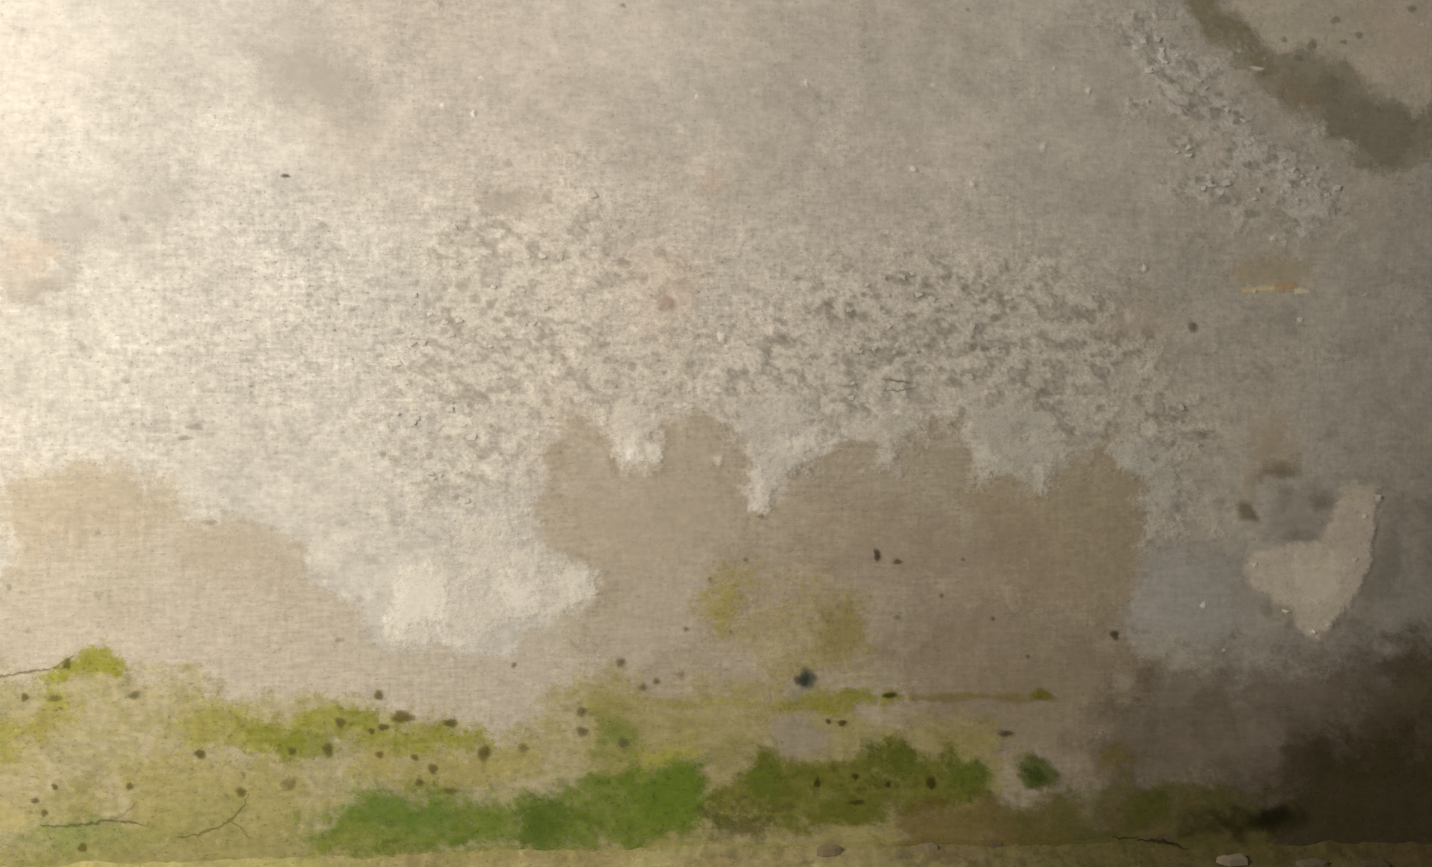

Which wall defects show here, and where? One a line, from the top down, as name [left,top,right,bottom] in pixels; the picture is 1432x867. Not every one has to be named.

damp [1184,0,1432,176]
crack [0,655,77,677]
damp [0,383,1432,846]
crack [0,793,249,838]